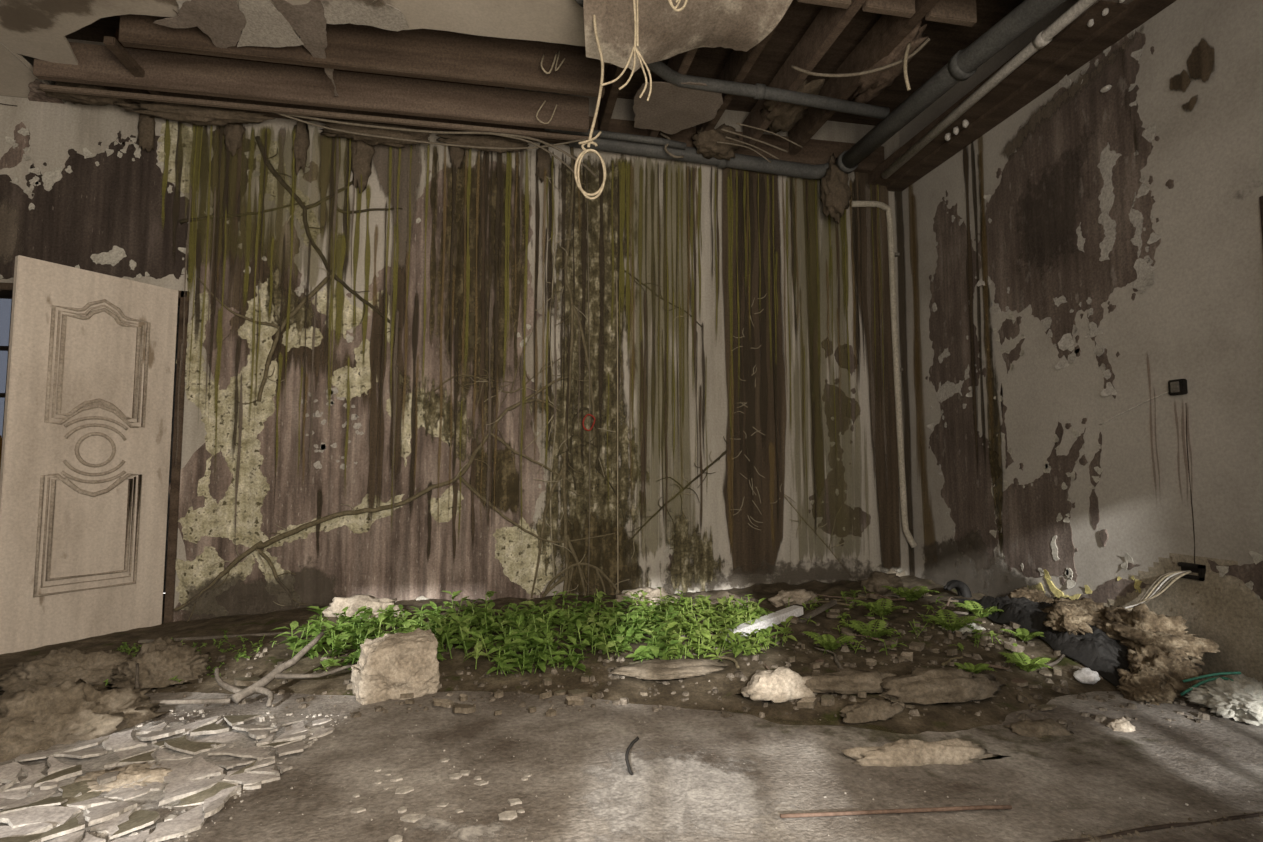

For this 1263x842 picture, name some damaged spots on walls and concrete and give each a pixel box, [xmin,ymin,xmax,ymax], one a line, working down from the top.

peeling [28,79,64,104]
damp [184,489,337,622]
peeling [0,122,558,622]
peeling [153,0,409,96]
damp [162,119,1056,599]
peeling [925,29,1174,603]